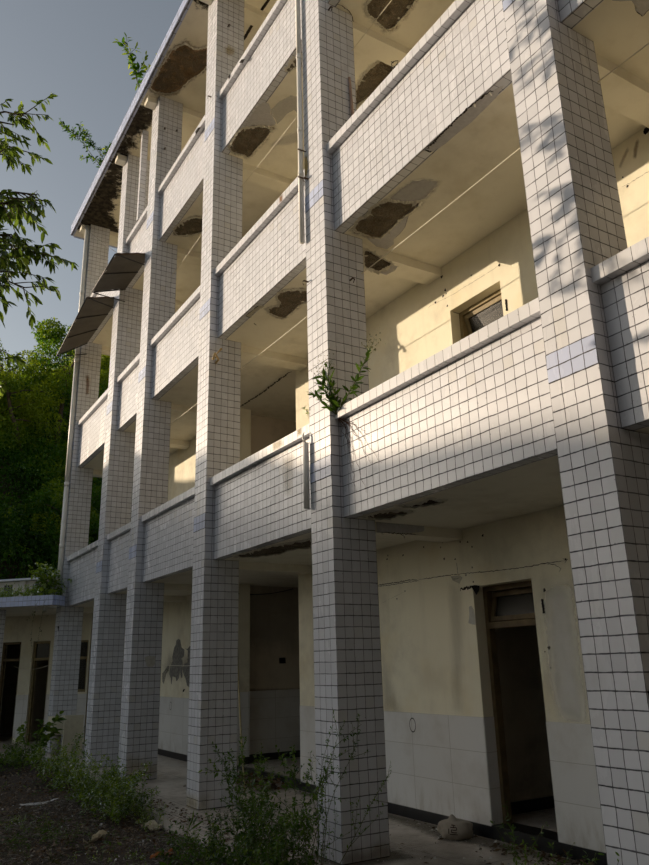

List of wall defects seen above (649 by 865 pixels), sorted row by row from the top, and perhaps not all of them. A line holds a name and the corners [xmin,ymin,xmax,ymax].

spalling [364,0,417,31]
spalling [149,41,207,96]
spalling [355,60,394,106]
spalling [227,102,276,158]
spalling [172,216,202,237]
spalling [352,199,423,275]
spalling [246,288,307,325]
crack [241,372,290,406]
peeling [361,497,448,535]
spalling [231,539,312,559]
crack [378,559,568,591]
peeling [169,639,190,692]